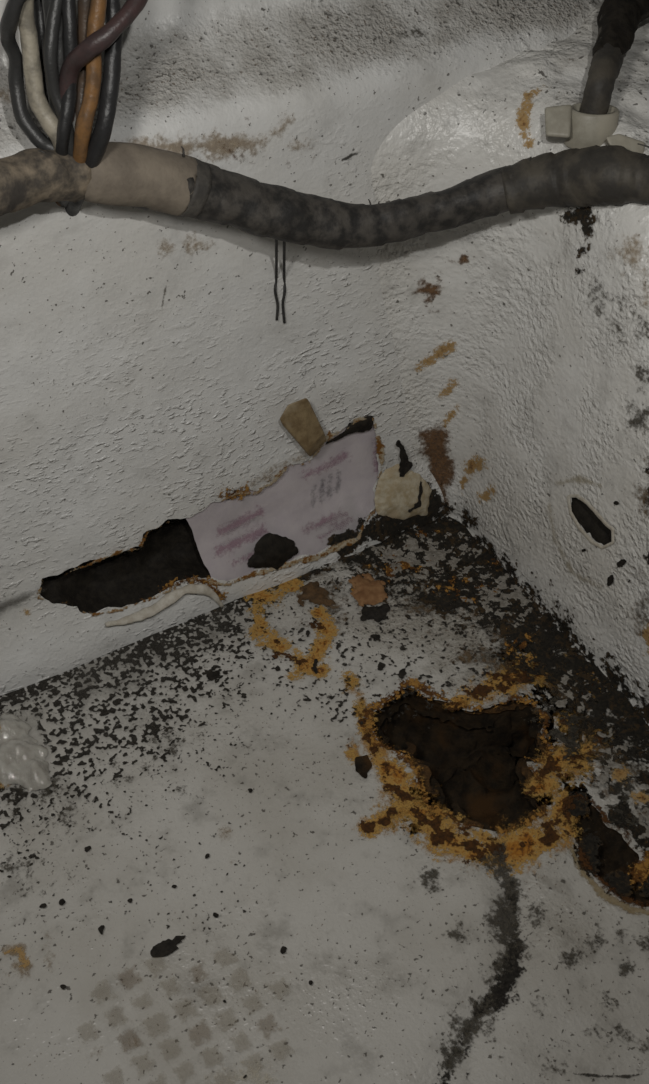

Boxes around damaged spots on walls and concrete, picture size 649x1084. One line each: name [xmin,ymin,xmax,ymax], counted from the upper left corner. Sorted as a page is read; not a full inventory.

rust [516,88,541,149]
rust [416,340,457,372]
rust [438,379,457,398]
spalling [40,518,211,614]
spalling [571,498,611,552]
spalling [607,559,626,586]
rust [160,406,649,877]
spalling [0,580,549,883]
spalling [560,791,649,915]
peeling [473,896,527,1015]